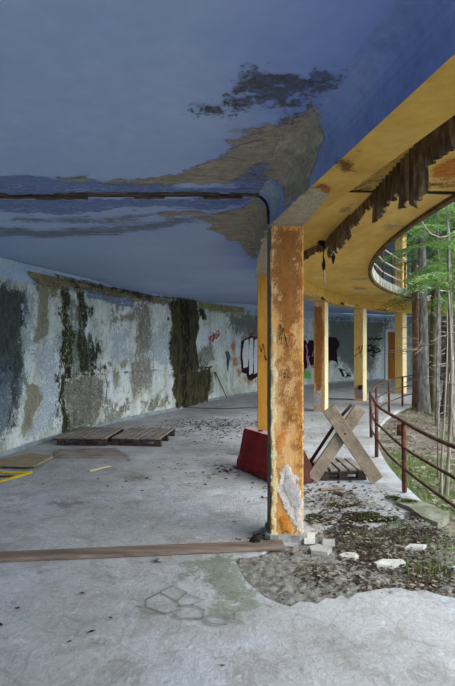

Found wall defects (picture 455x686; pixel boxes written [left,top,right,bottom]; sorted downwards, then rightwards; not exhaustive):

peeling [0,163,331,277]
damp [0,271,171,449]
rust [271,226,304,485]
peeling [271,332,304,535]
crack [137,586,245,625]
spalling [236,522,455,606]